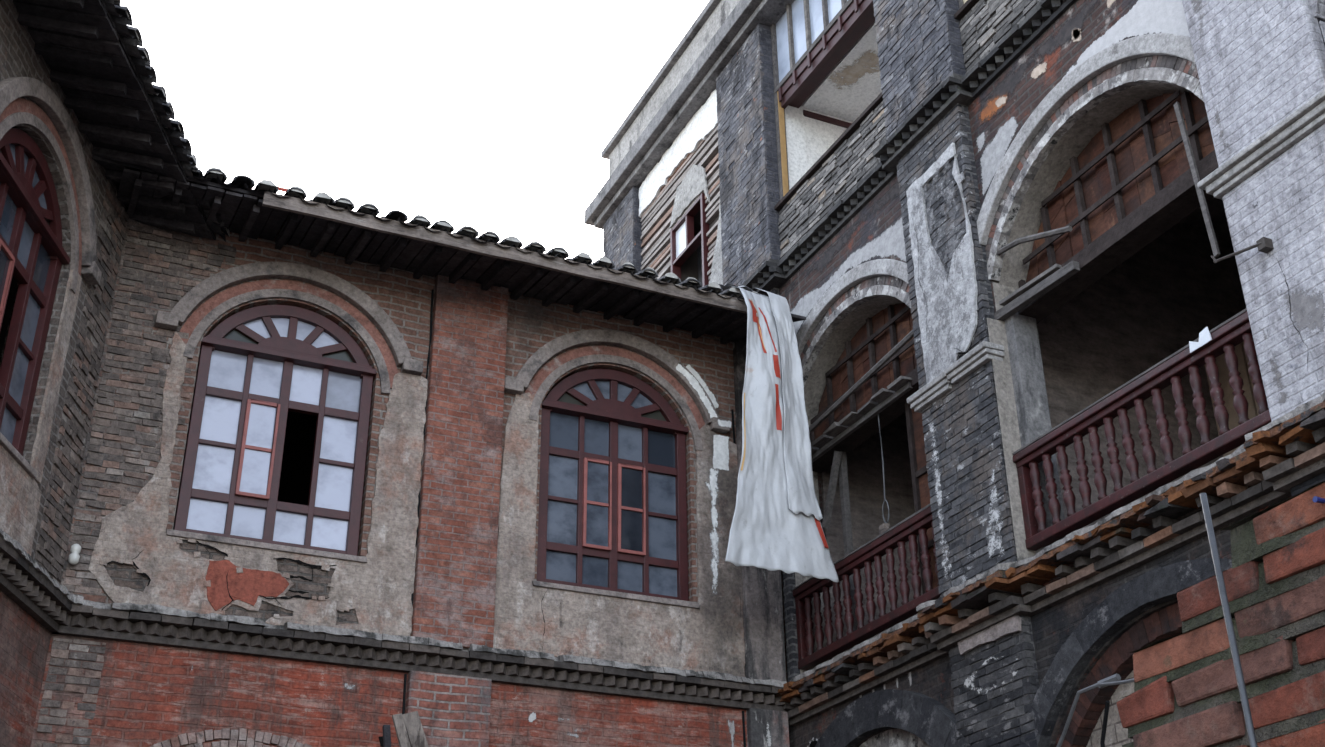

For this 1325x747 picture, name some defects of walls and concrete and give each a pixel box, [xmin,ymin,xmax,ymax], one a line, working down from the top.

leakage [830,50,879,89]
peeling [1031,61,1047,79]
peeling [1062,0,1204,79]
peeling [976,96,1018,195]
peeling [790,142,978,383]
flaking render [34,181,236,596]
peeling [1270,358,1286,403]
peeling [928,420,953,578]
peeling [986,469,1004,558]
peeling [177,538,358,625]